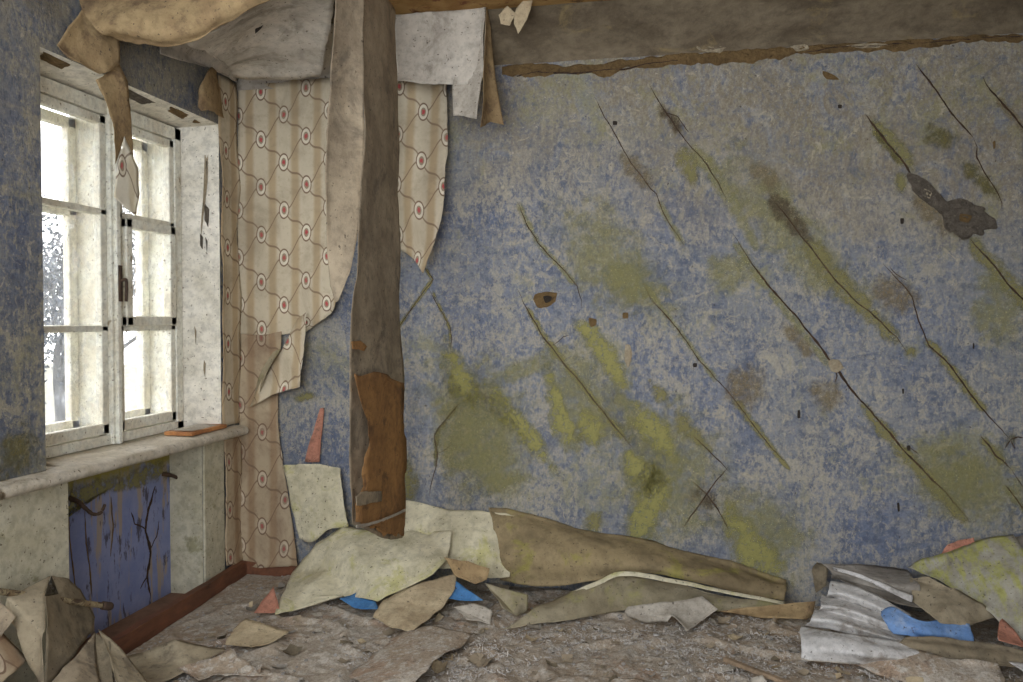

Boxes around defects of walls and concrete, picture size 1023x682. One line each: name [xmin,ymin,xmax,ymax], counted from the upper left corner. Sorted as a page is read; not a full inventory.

peeling [40,52,70,69]
peeling [129,90,155,104]
peeling [168,107,200,123]
peeling [200,155,209,250]
crack [595,98,684,245]
spalling [907,173,998,240]
crack [918,67,1002,203]
spalling [533,292,557,308]
crack [644,86,969,522]
crack [753,165,1023,511]
water stain [438,352,712,538]
crack [131,487,159,597]